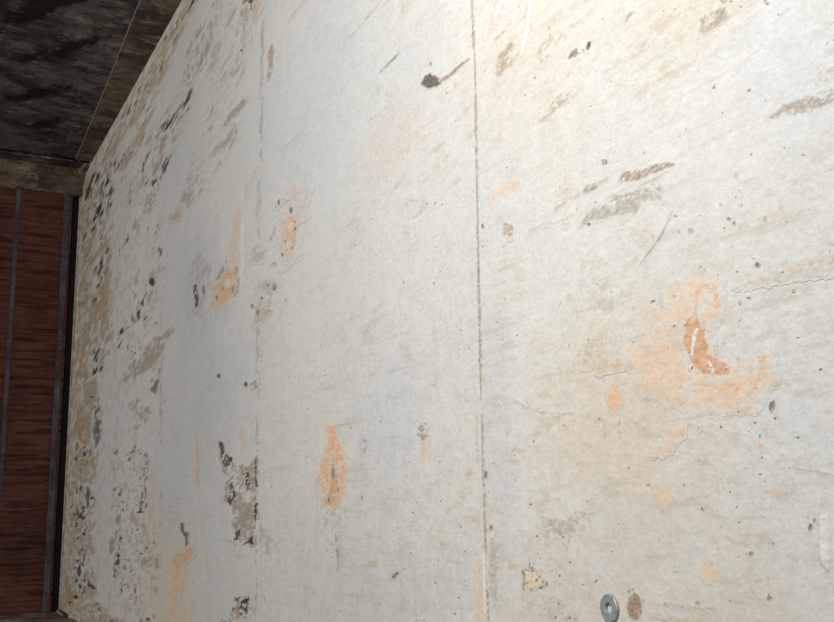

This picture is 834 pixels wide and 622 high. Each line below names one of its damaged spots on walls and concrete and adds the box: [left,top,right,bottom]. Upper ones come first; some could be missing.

peeling [234,0,265,50]
peeling [61,0,221,622]
rust [206,160,266,318]
peeling [249,224,289,329]
rust [625,265,780,419]
peeling [217,439,280,561]
rust [314,421,352,535]
peeling [218,593,255,622]